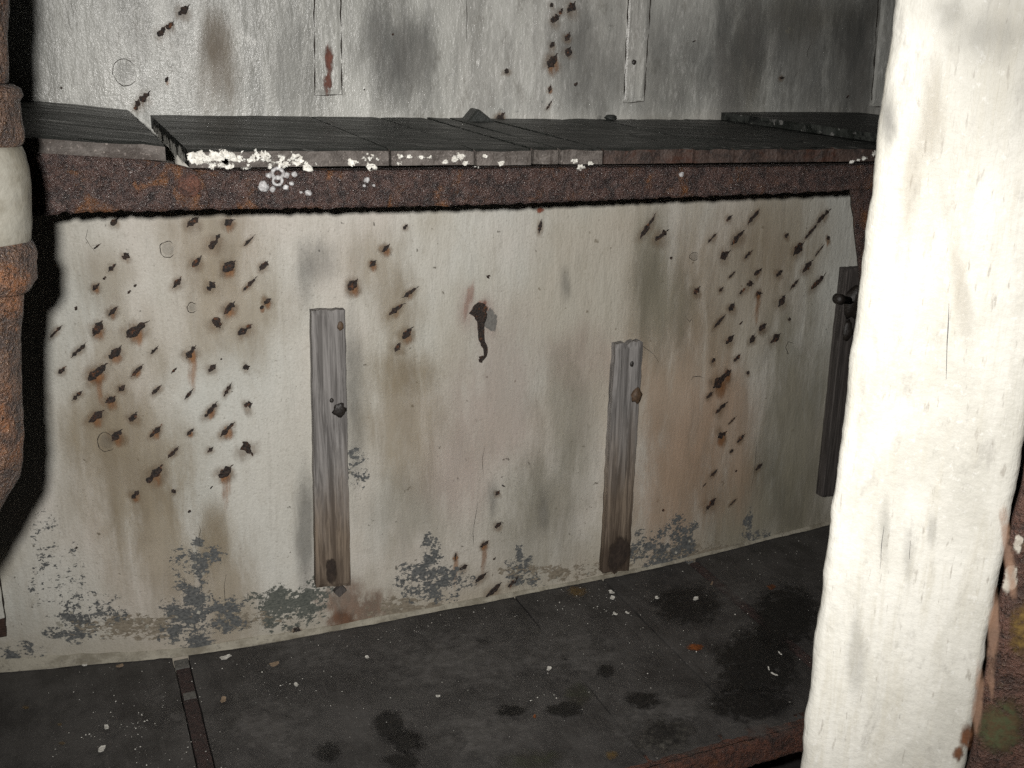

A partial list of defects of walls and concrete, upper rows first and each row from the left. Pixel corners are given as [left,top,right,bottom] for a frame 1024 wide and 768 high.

corrosion [324,46,333,94]
damp [154,127,317,196]
peeling [629,507,771,568]
peeling [0,511,335,659]
peeling [365,531,613,617]
damp [711,586,818,721]
damp [375,711,423,768]